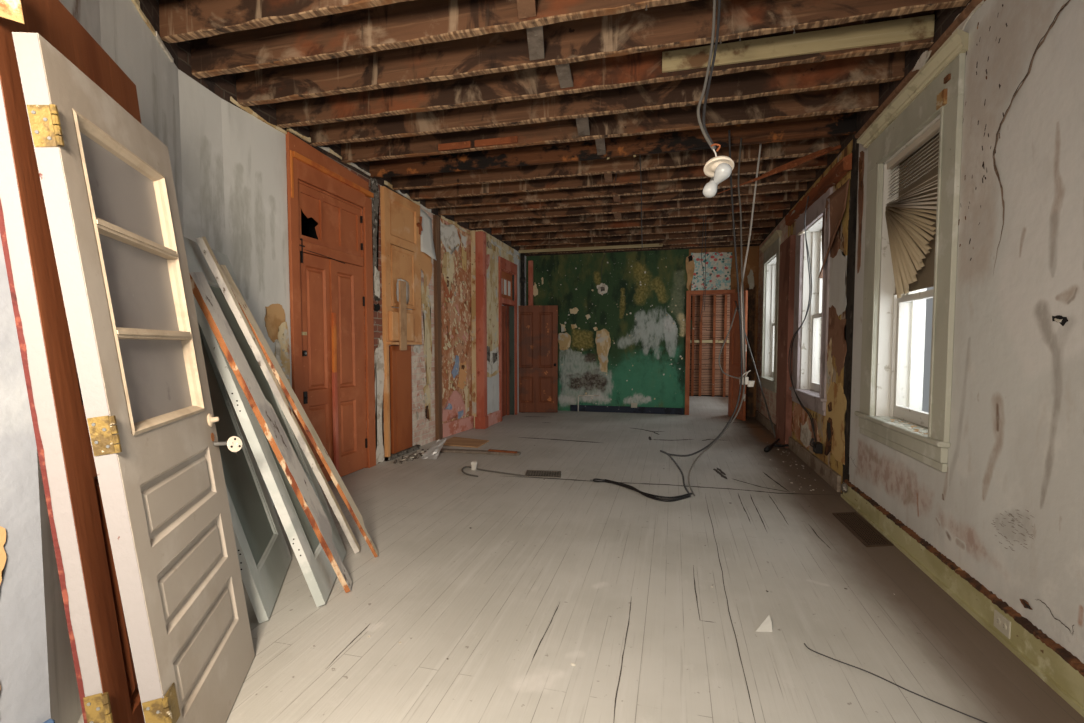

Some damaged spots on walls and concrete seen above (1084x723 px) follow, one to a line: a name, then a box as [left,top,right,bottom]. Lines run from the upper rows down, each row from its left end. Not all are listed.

peeling [230,96,471,425]
flaking render [374,338,385,464]
peeling [558,255,693,375]
peeling [791,151,865,465]
water stain [1030,118,1082,513]